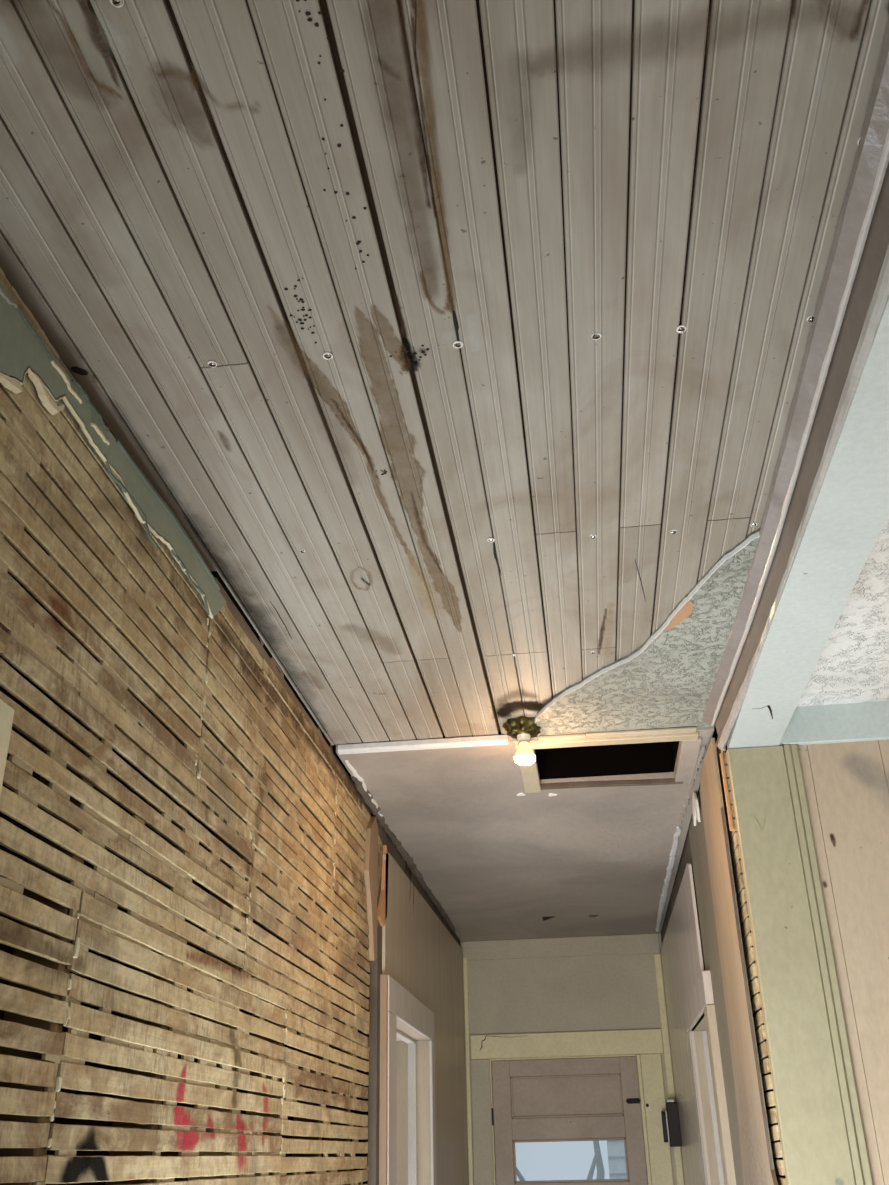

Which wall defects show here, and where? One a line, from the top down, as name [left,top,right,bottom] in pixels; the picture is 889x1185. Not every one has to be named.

water stain [397,0,455,313]
flaking render [0,282,227,618]
water stain [307,358,458,612]
water stain [367,307,424,371]
peeling [664,600,694,631]